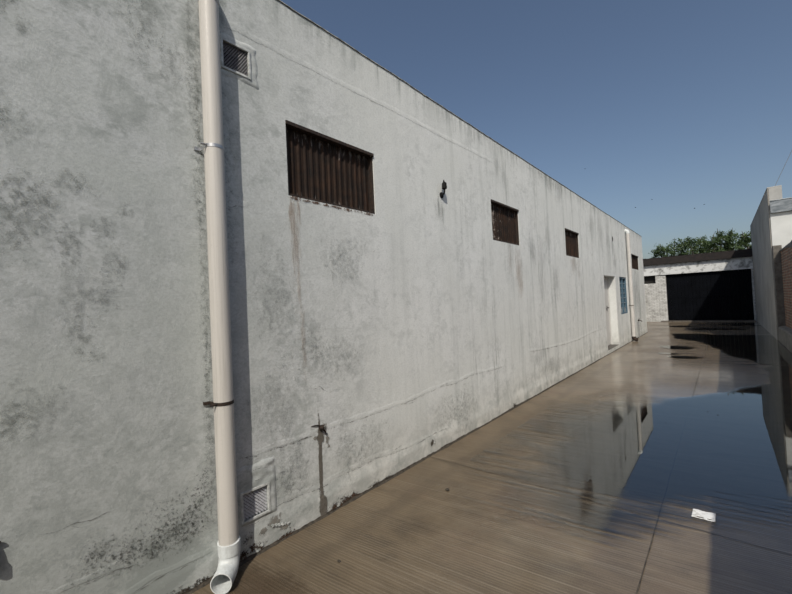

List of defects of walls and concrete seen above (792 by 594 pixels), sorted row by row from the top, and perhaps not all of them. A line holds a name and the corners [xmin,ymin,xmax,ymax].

crack [236,430,317,459]
water stain [87,474,212,575]
peeling [240,512,295,562]
crack [122,548,212,594]